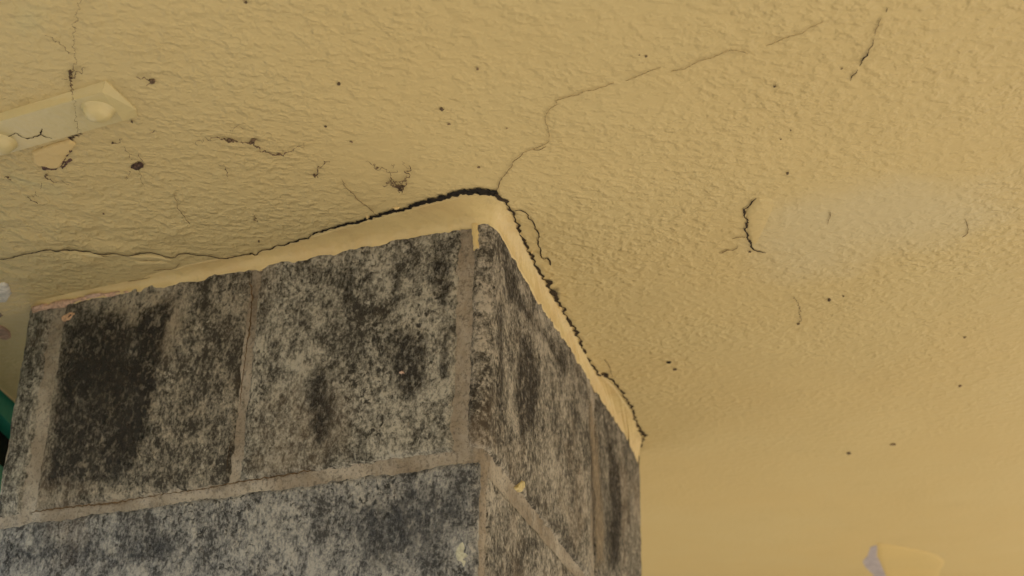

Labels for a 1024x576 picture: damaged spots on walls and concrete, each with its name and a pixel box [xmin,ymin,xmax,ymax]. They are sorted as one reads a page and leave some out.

crack [850,8,888,81]
crack [0,22,822,447]
leakage [48,298,173,486]